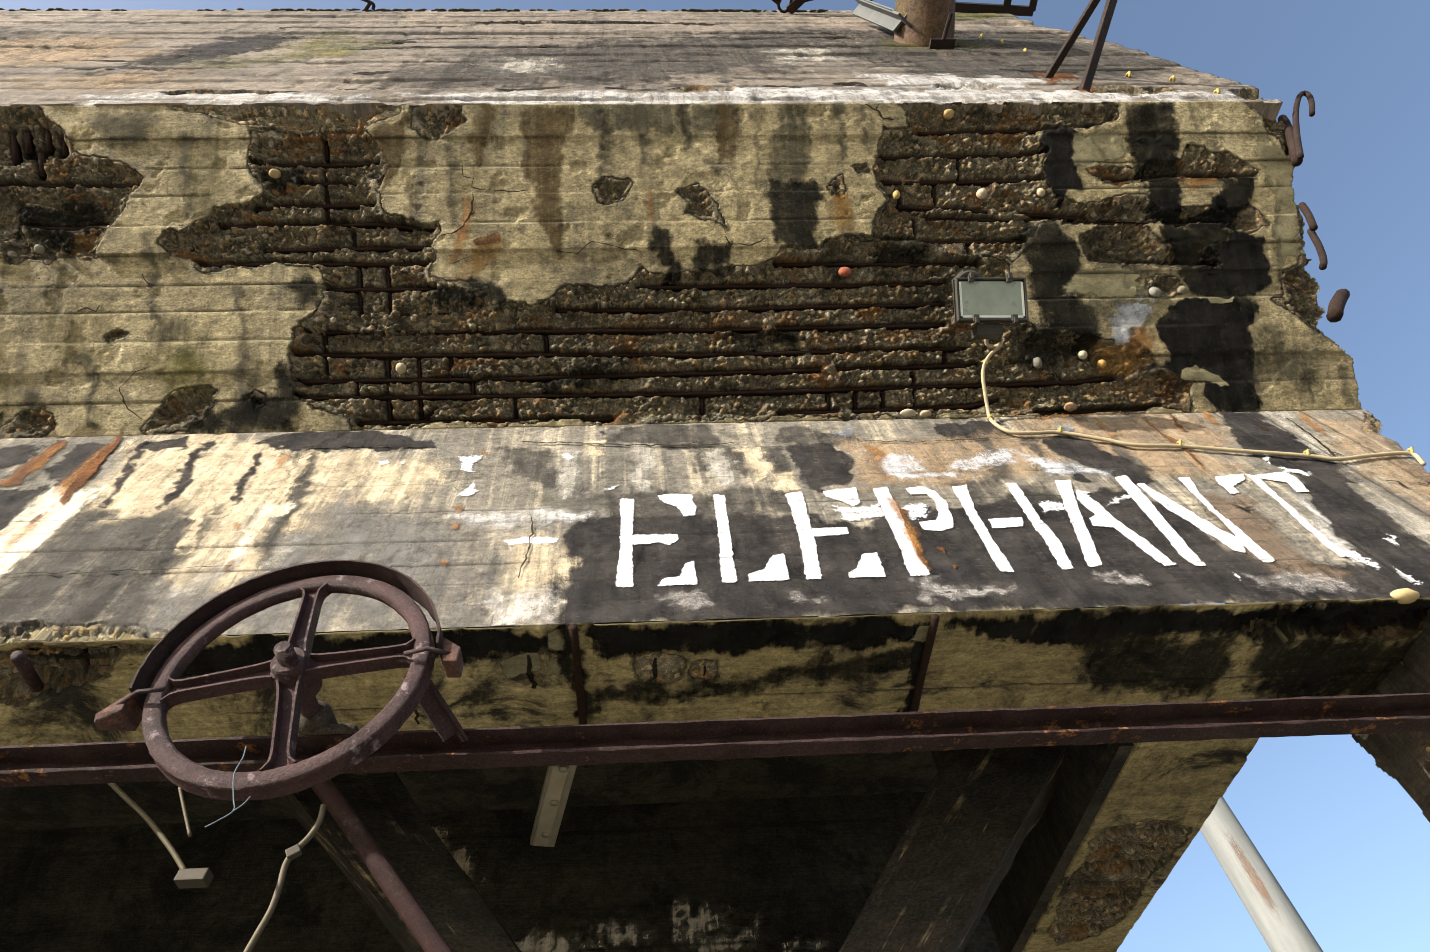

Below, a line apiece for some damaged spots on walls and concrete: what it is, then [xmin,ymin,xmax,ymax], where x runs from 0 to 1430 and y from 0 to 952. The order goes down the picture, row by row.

spalling [0,107,144,265]
leakage [0,13,1241,258]
spalling [159,82,1258,431]
spalling [1234,88,1315,169]
spalling [1271,201,1350,343]
spalling [0,407,57,438]
rust [0,439,68,486]
rust [59,435,123,505]
leakage [0,355,577,678]
leakage [501,225,1430,537]
leakage [1204,495,1358,582]
leakage [585,599,1430,699]